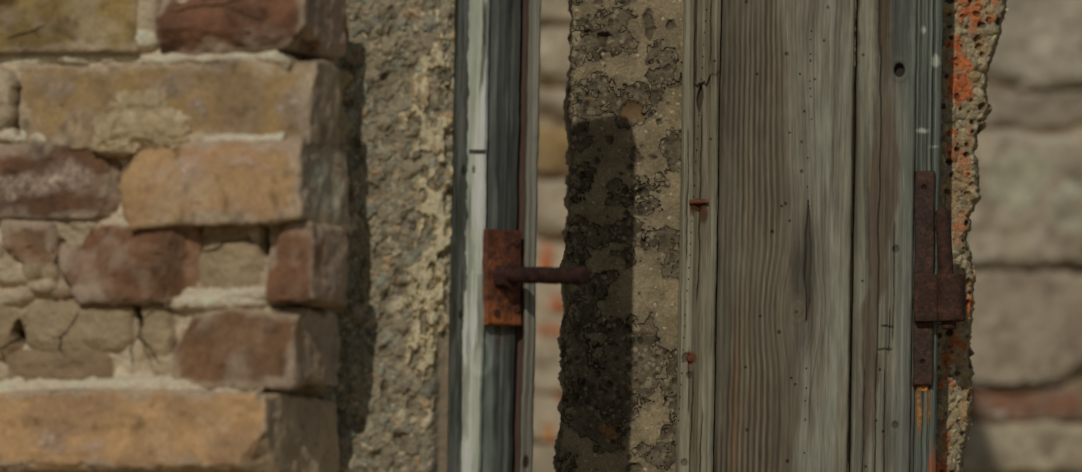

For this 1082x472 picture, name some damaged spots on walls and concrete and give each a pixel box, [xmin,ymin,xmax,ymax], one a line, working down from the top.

spalling [567,0,683,279]
spalling [544,312,677,472]